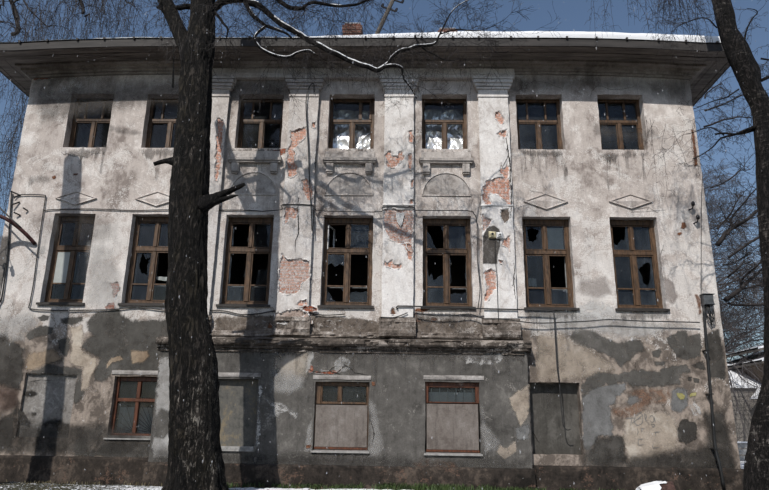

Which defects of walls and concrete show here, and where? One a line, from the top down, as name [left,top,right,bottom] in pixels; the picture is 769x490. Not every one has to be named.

flaking render [494,111,508,138]
flaking render [273,121,316,200]
flaking render [383,131,415,270]
flaking render [482,163,512,223]
flaking render [105,281,120,309]
flaking render [256,255,317,328]
flaking render [484,259,502,301]
leakage [0,389,169,455]
leakage [585,411,734,469]